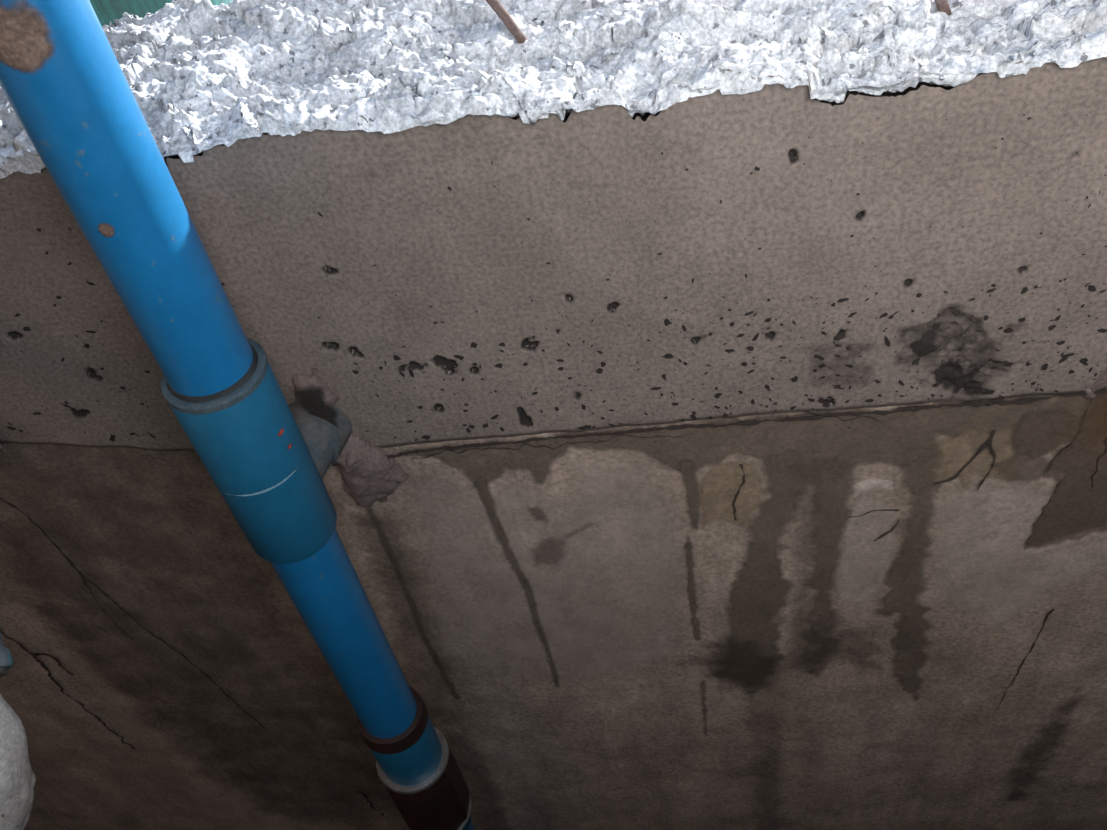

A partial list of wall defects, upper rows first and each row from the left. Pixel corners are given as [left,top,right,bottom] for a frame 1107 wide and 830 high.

spalling [0,87,45,179]
spalling [102,0,1107,163]
crack [0,629,136,749]
crack [0,498,267,729]
damp [404,396,1045,699]